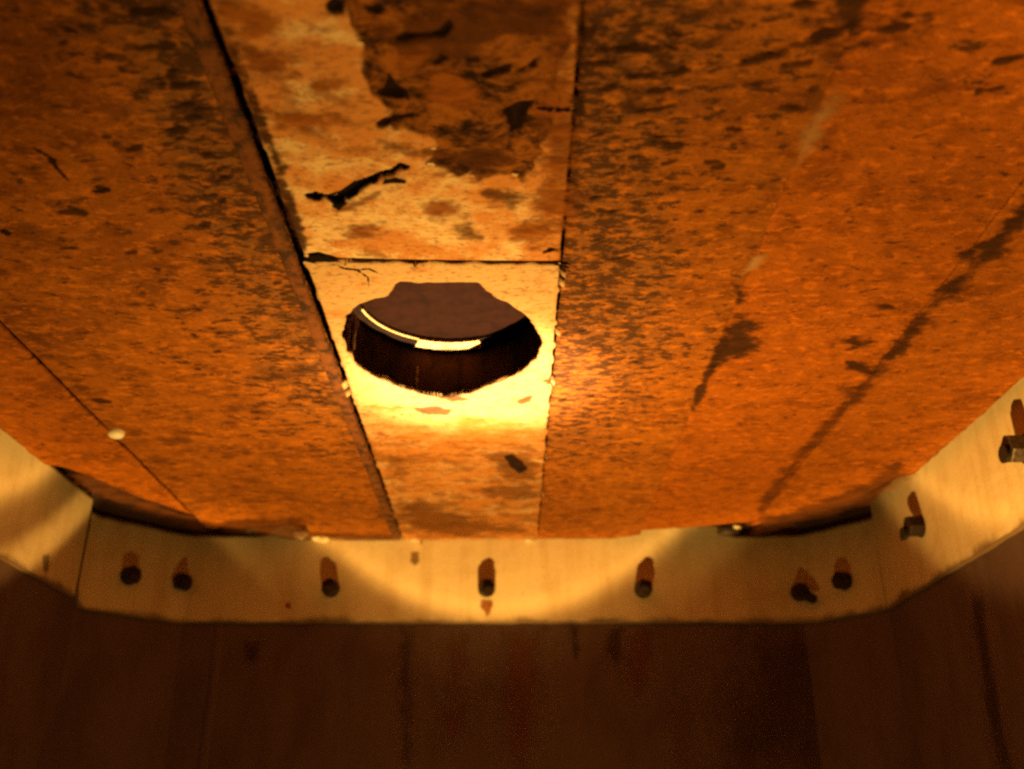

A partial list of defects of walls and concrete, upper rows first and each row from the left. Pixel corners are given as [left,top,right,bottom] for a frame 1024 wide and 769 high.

peeling [326,0,574,181]
rust [510,2,577,251]
crack [304,162,410,211]
rust [343,226,379,239]
rust [424,203,483,240]
rust [346,316,356,356]
leakage [692,328,730,410]
leakage [756,206,1024,512]
rust [415,396,468,415]
rust [73,473,206,530]
rust [223,519,400,541]
rust [752,459,908,535]